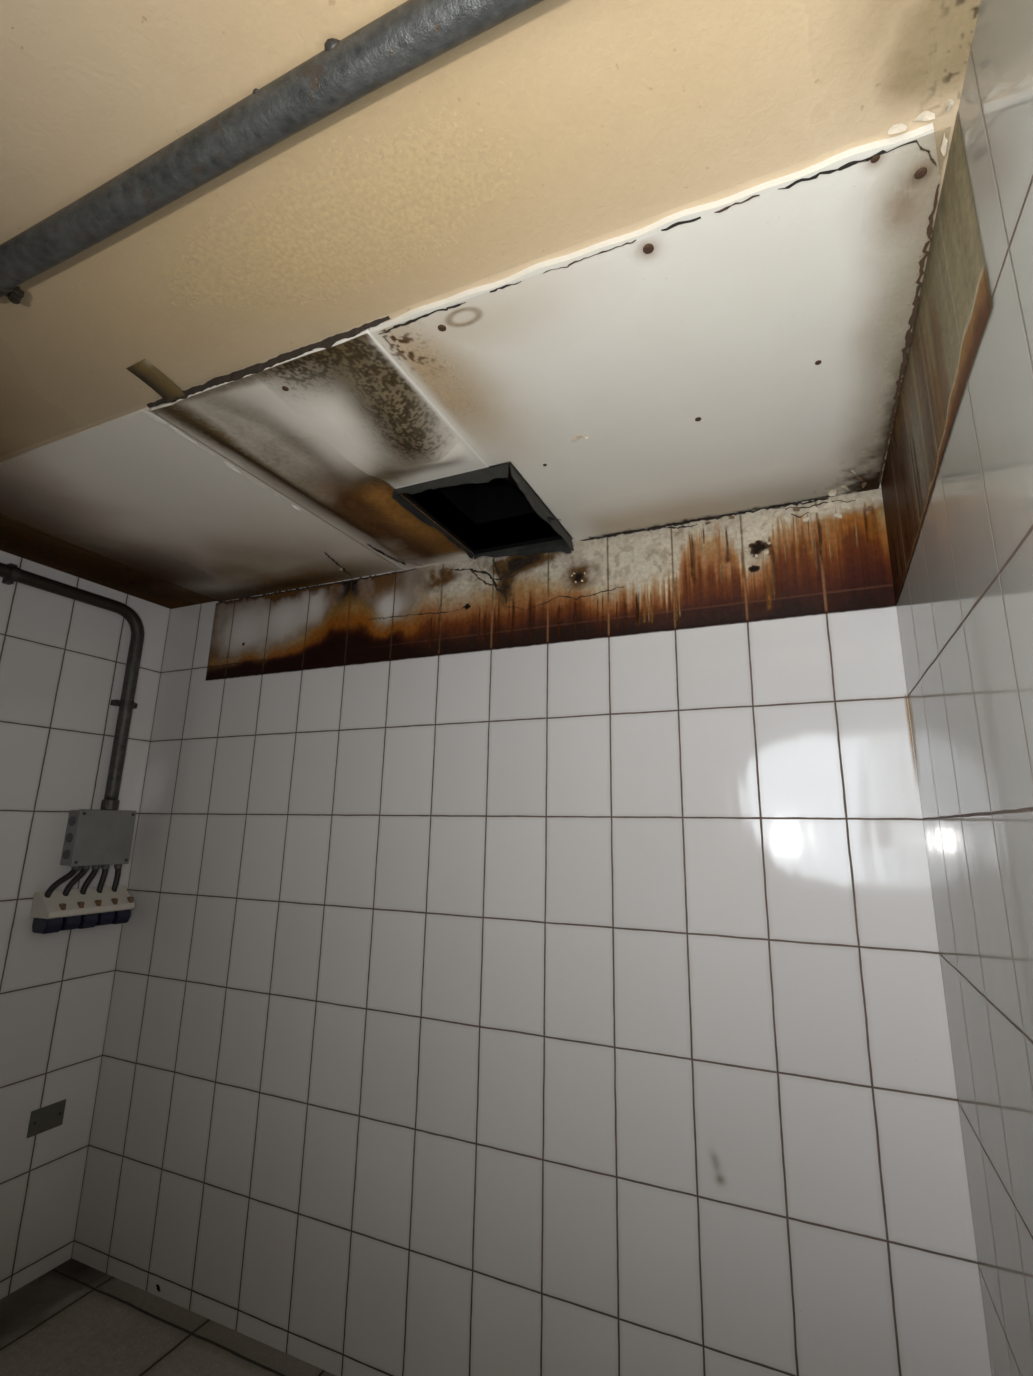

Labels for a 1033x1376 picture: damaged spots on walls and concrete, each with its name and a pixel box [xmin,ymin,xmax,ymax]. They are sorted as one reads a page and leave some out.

mould [925,0,981,83]
water stain [902,126,951,319]
water stain [269,329,472,456]
rust [205,112,993,681]
crack [379,140,940,541]